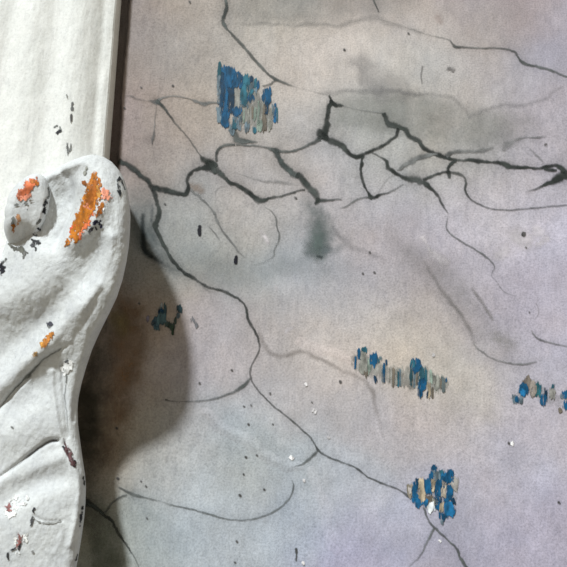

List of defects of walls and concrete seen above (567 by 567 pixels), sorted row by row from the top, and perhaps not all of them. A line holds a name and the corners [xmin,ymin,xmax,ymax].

crack [222,0,288,86]
crack [451,42,567,77]
peeling [216,62,278,136]
crack [118,95,567,398]
peeling [146,302,182,335]
peeling [353,346,448,399]
peeling [512,374,567,413]
crack [261,394,408,497]
peeling [407,464,459,525]
crack [422,507,468,567]